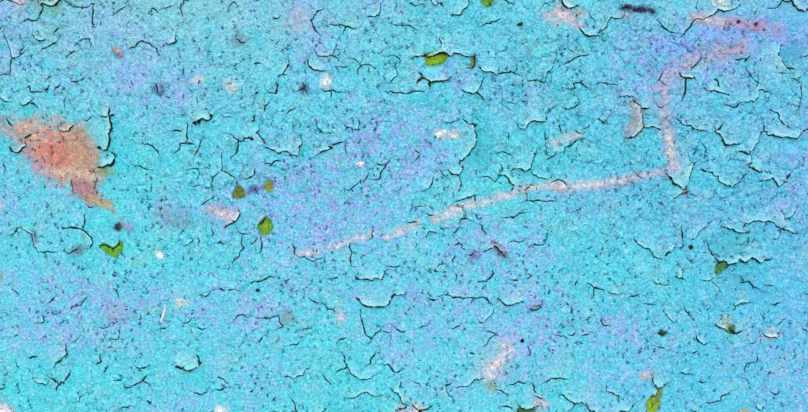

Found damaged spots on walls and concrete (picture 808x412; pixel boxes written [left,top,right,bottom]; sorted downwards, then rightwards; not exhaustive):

crack [0,0,115,186]
spalling [101,241,123,259]
spalling [233,186,245,198]
spalling [258,217,273,235]
crack [145,0,625,205]
crack [286,245,484,412]
spalling [424,53,447,66]
crack [410,119,544,355]
crack [499,378,634,412]
crack [483,45,808,219]
spalling [645,388,662,412]
crack [575,207,798,412]